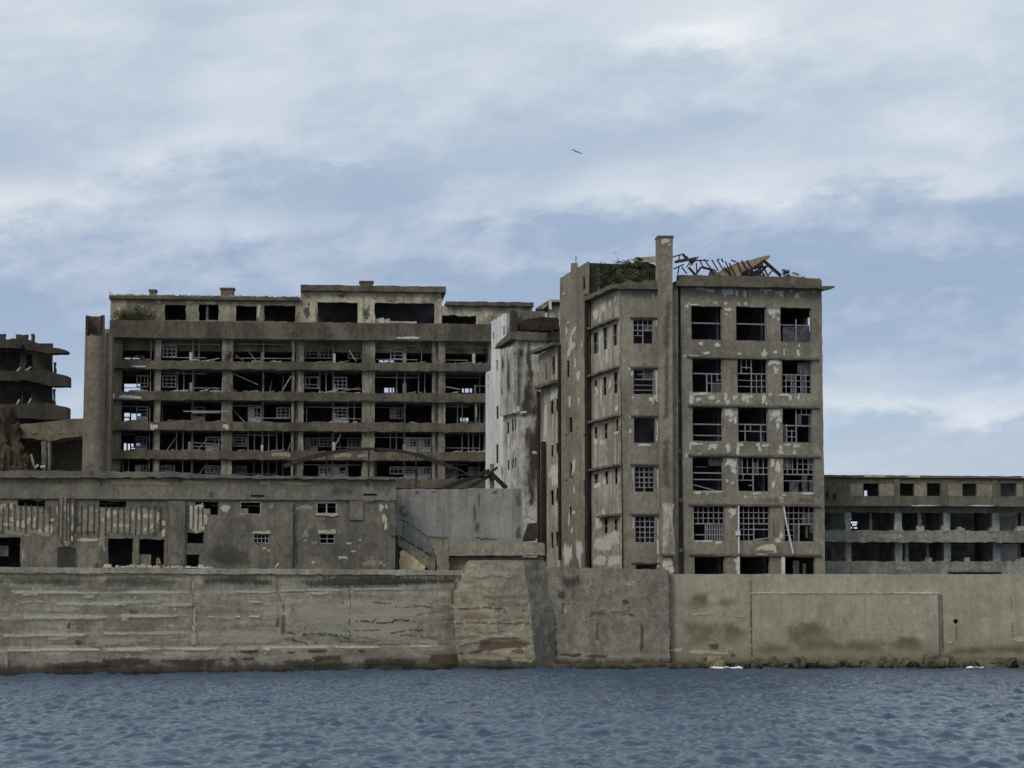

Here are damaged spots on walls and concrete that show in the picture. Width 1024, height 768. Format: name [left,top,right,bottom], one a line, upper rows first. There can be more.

peeling [681,287,816,315]
water stain [518,343,537,505]
peeling [544,388,580,437]
peeling [566,326,583,382]
peeling [649,371,658,404]
peeling [689,392,800,431]
peeling [761,344,800,375]
spalling [0,496,166,553]
peeling [563,508,621,568]
peeling [656,470,674,573]